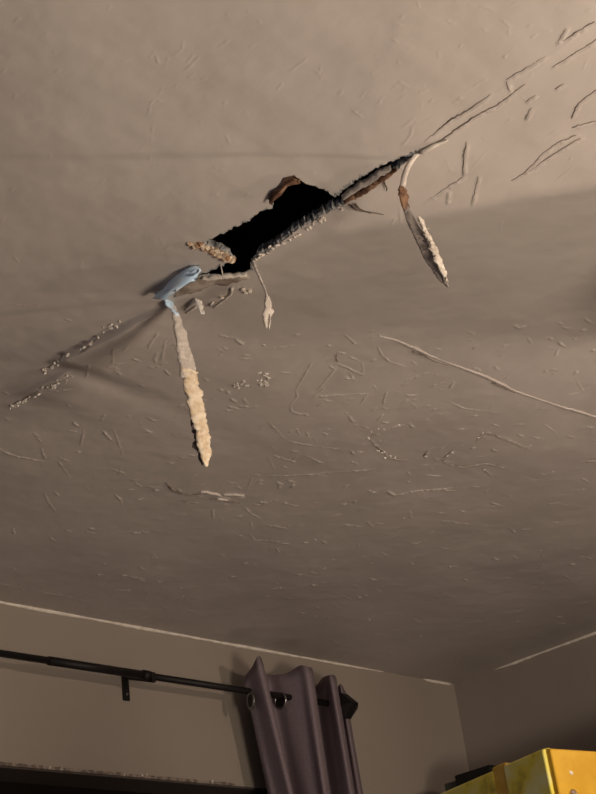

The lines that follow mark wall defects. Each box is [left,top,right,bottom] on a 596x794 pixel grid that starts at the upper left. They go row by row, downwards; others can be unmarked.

crack [419,22,596,203]
spalling [187,160,396,275]